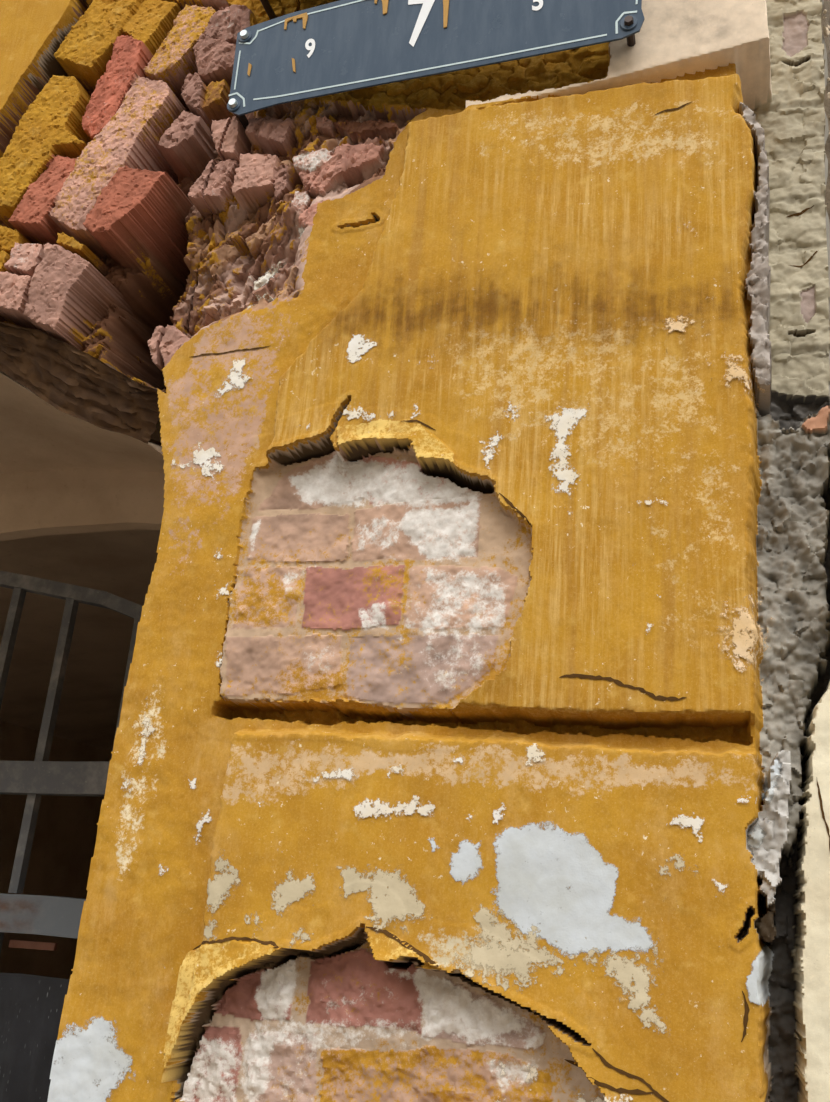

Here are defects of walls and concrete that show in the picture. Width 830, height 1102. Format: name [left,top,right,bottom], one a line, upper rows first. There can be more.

spalling [0,0,612,444]
spalling [215,430,533,718]
crack [559,674,687,701]
peeling [303,767,359,782]
peeling [353,795,435,821]
crack [817,781,830,849]
spalling [181,803,667,1102]
crack [170,926,669,1102]
peeling [47,1016,136,1102]